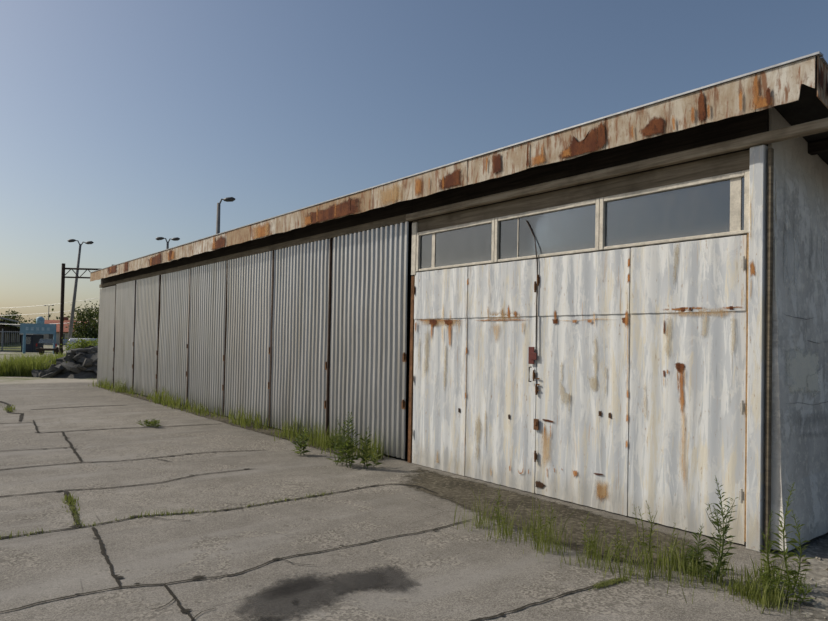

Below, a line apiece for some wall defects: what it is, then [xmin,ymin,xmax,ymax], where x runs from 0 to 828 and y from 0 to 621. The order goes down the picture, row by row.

rust [752,76,772,109]
rust [559,121,606,159]
rust [631,116,675,137]
rust [486,154,501,174]
rust [415,169,461,195]
rust [305,196,360,225]
rust [252,224,271,239]
rust [481,307,524,338]
rust [663,363,685,480]
rust [593,473,606,500]
crack [0,401,472,621]
crack [469,586,594,621]